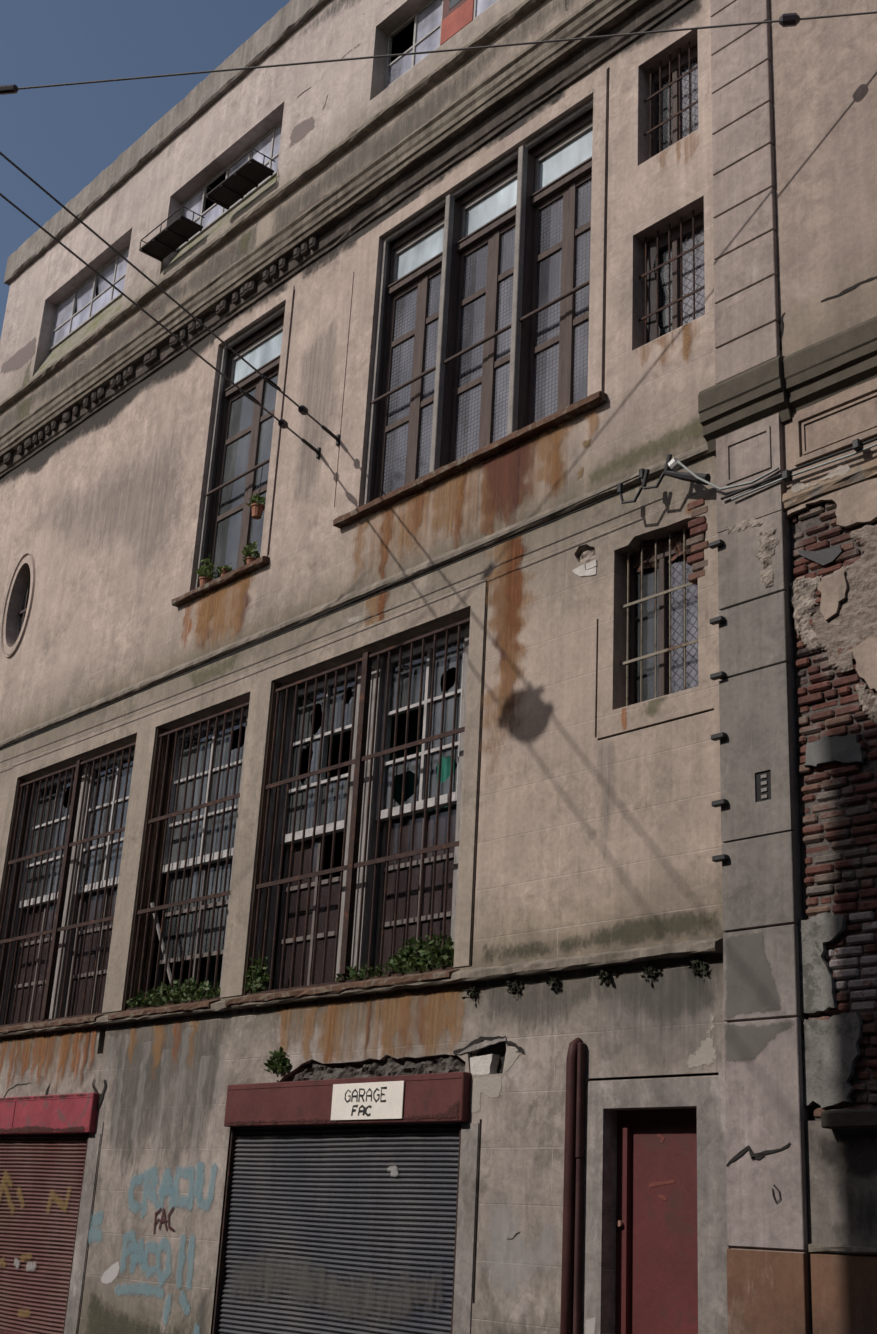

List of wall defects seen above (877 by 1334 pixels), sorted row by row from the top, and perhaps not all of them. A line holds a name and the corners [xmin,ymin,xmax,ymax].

crack [821,276,877,302]
crack [778,312,786,350]
rust [481,425,563,535]
rust [355,469,466,624]
spalling [572,546,597,577]
spalling [633,498,709,586]
rust [488,533,524,731]
spalling [726,465,877,1121]
rust [0,1027,96,1100]
spalling [282,1036,522,1113]
rust [0,1125,84,1134]
crack [726,1142,790,1203]